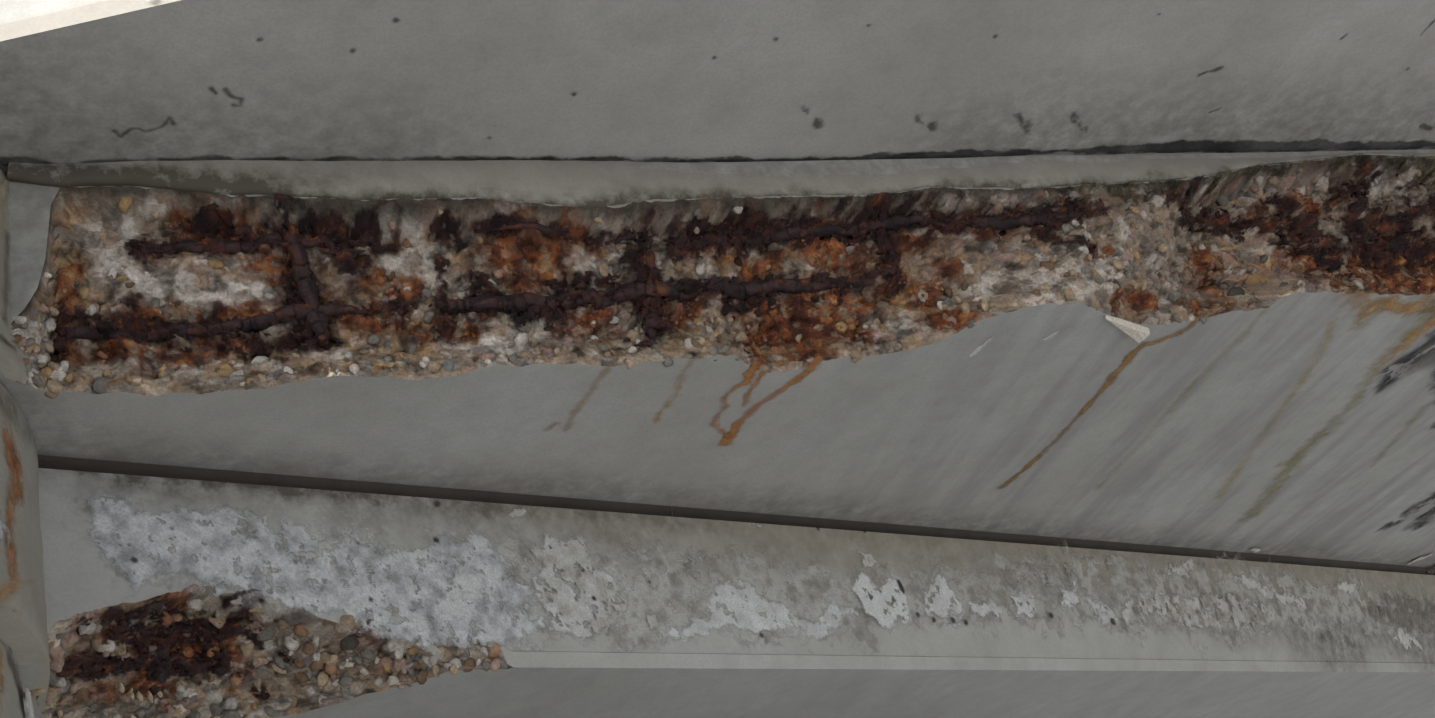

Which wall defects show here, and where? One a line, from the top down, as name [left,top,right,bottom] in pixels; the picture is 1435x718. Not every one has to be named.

spalling [0,154,1435,399]
corrosion [713,356,823,446]
corrosion [999,306,1223,489]
corrosion [1356,293,1435,359]
damp [1378,312,1435,392]
corrosion [0,429,23,601]
damp [1380,494,1435,530]
spalling [23,495,627,718]
damp [282,521,1435,655]